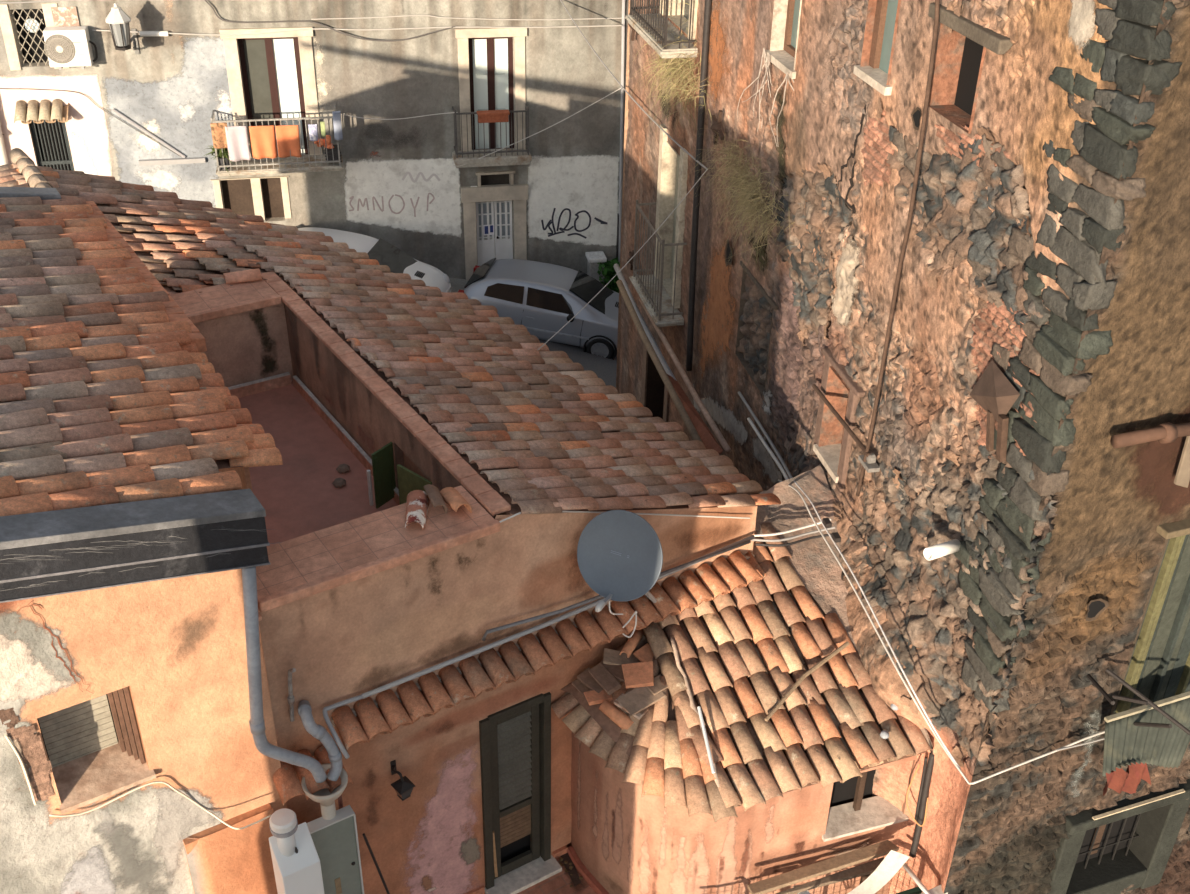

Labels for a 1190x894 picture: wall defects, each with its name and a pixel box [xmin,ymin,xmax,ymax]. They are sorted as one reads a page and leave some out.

crack [836,106,866,234]
spalling [766,163,861,346]
spalling [833,0,1182,767]
crack [16,601,94,694]
peeling [0,610,223,894]
peeling [407,750,481,894]
water stain [577,740,774,894]